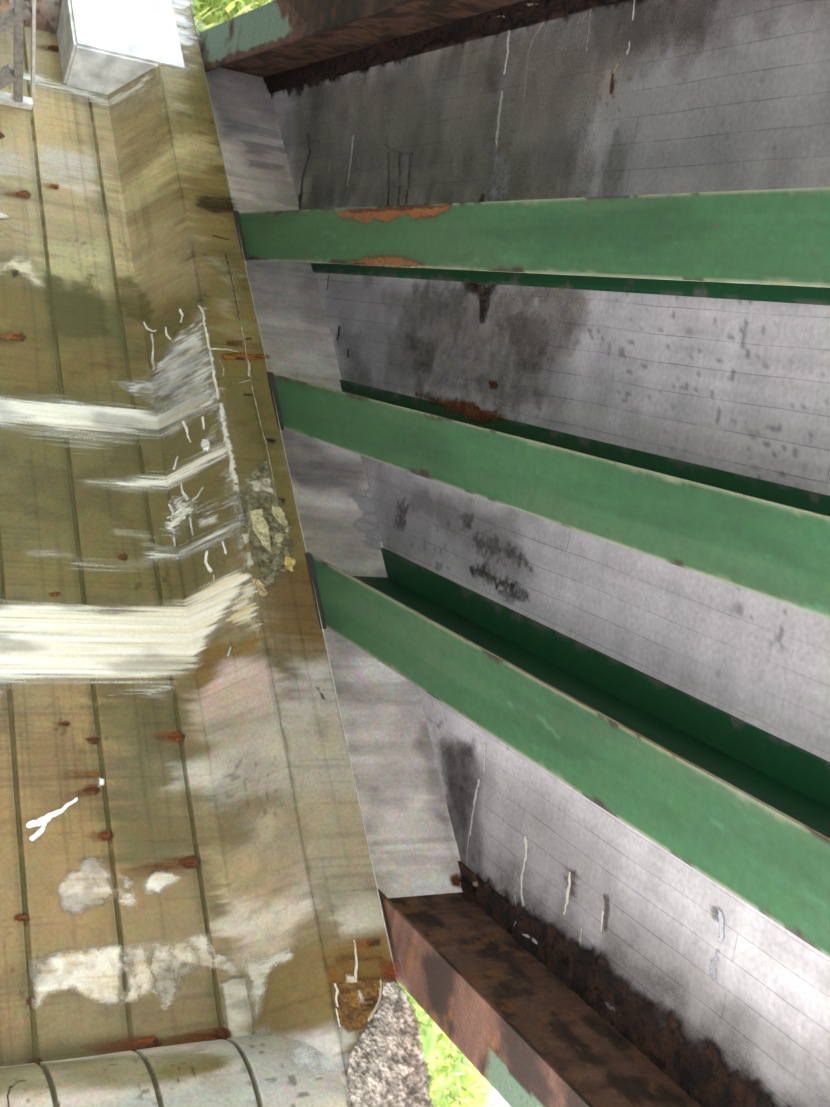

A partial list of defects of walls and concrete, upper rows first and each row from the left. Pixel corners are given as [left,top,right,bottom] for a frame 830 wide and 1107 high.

rust [348,255,424,268]
leakage [399,286,583,414]
rust [415,393,503,423]
leakage [0,273,263,695]
spalling [234,461,296,596]
mould [463,515,532,600]
leakage [447,742,475,830]
peeling [58,858,180,914]
peeling [31,935,293,1038]
rust [97,1028,232,1052]
spalling [334,979,433,1107]